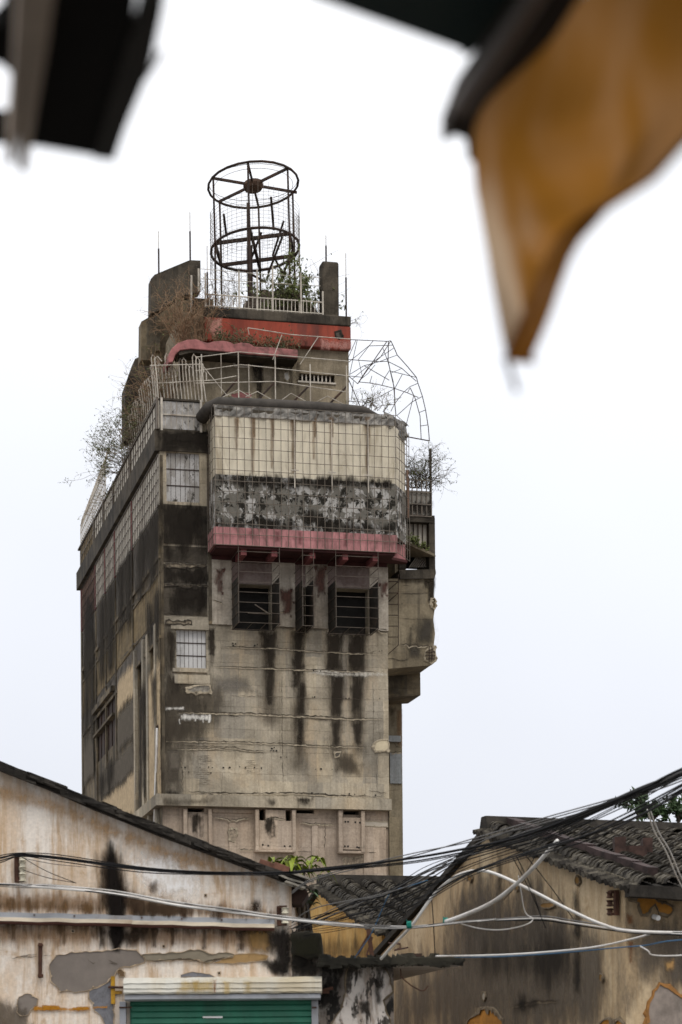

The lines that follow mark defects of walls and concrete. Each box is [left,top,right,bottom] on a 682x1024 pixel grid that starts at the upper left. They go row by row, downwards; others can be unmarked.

damp [83,501,211,807]
damp [261,632,276,722]
damp [292,631,383,772]
damp [82,816,203,866]
flaking render [16,993,38,1016]
flaking render [49,944,268,1024]
damp [0,851,368,1008]
damp [360,967,389,1013]
flaking render [466,991,505,1024]
damp [394,868,603,1024]
flaking render [627,898,674,918]
flaking render [643,982,682,1024]